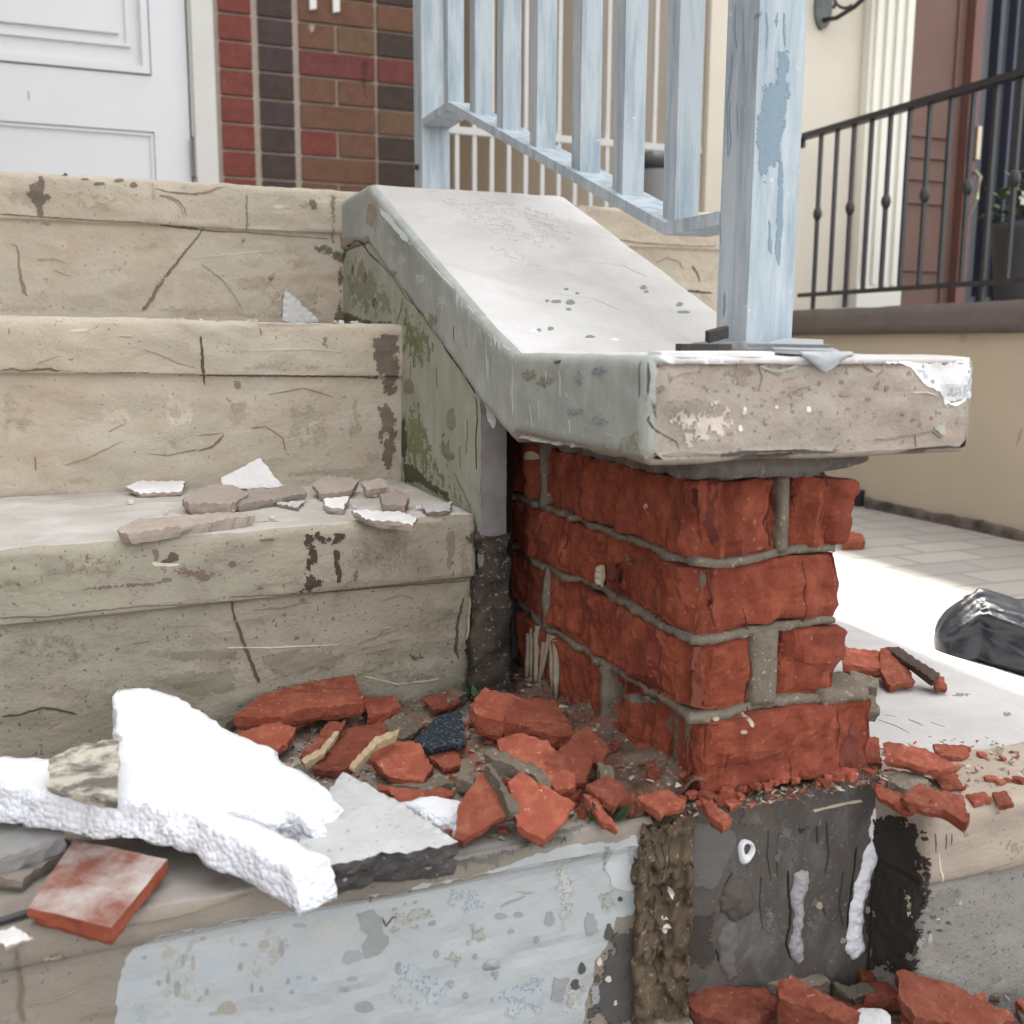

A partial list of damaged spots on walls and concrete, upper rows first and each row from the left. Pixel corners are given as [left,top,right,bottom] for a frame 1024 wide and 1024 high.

peeling [726,4,791,265]
crack [0,186,511,469]
damp [367,334,411,396]
damp [382,431,397,470]
spalling [644,363,835,459]
peeling [884,361,972,450]
flaking render [117,475,410,586]
crack [1,580,471,685]
spalling [619,673,662,695]
spalling [689,645,707,709]
spalling [839,721,864,769]